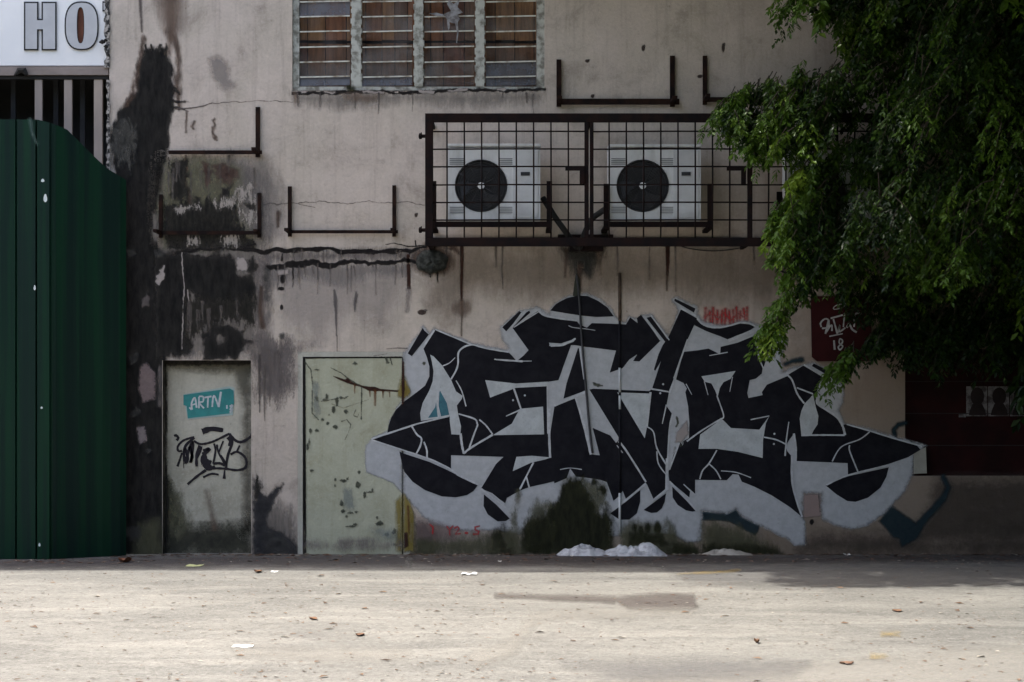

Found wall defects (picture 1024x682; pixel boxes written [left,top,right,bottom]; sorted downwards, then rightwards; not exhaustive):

leakage [110,0,421,554]
rust [333,362,411,417]